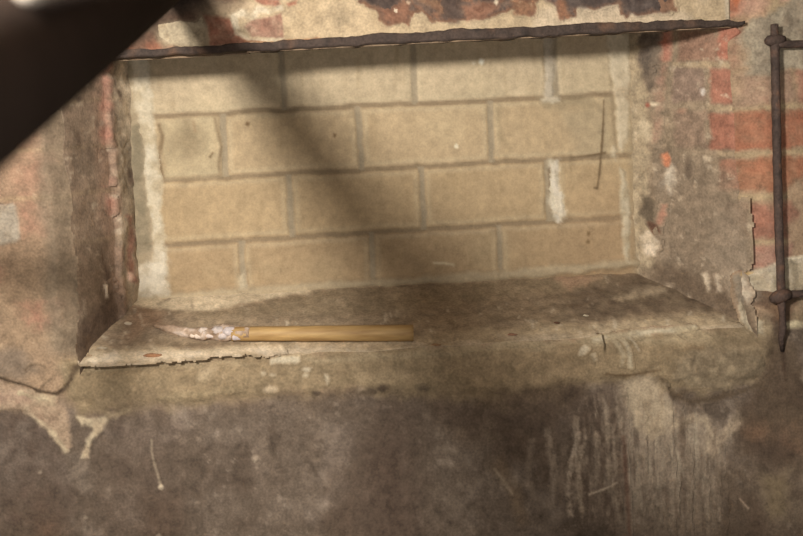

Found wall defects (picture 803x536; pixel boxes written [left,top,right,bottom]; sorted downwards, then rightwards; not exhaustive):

corrosion [355,0,679,29]
spalling [730,0,774,22]
spalling [632,31,695,261]
corrosion [751,290,801,344]
crack [0,354,92,395]
damp [0,210,314,536]
damp [300,197,803,536]